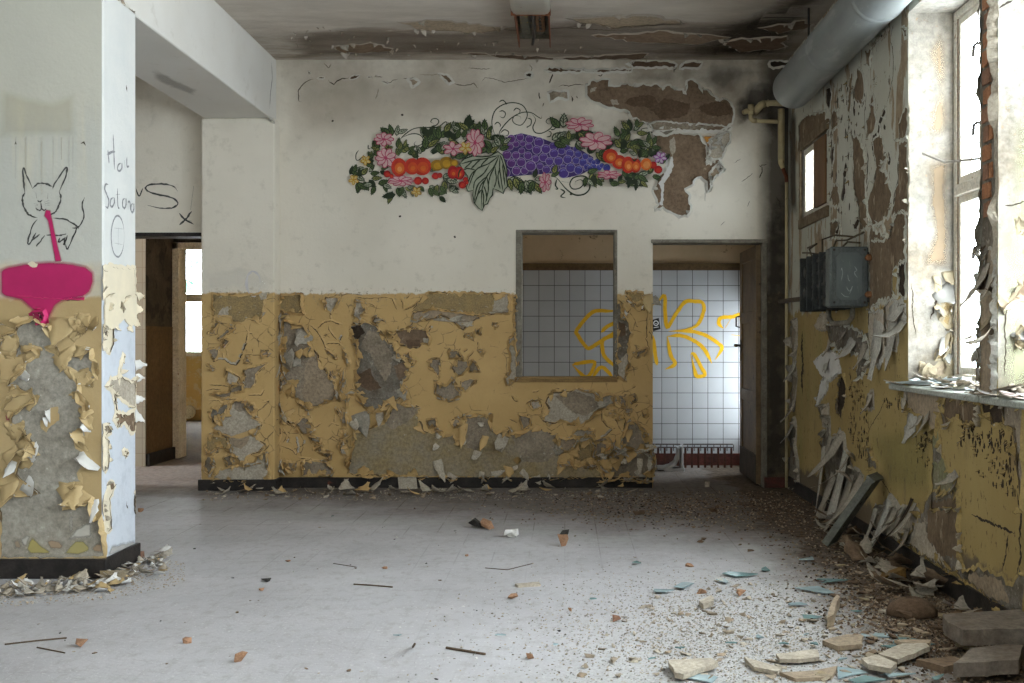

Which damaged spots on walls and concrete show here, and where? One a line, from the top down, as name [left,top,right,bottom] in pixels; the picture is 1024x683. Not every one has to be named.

crack [298,64,347,101]
peeling [290,14,816,219]
peeling [0,262,147,559]
peeling [201,290,662,489]
peeling [780,0,1024,612]